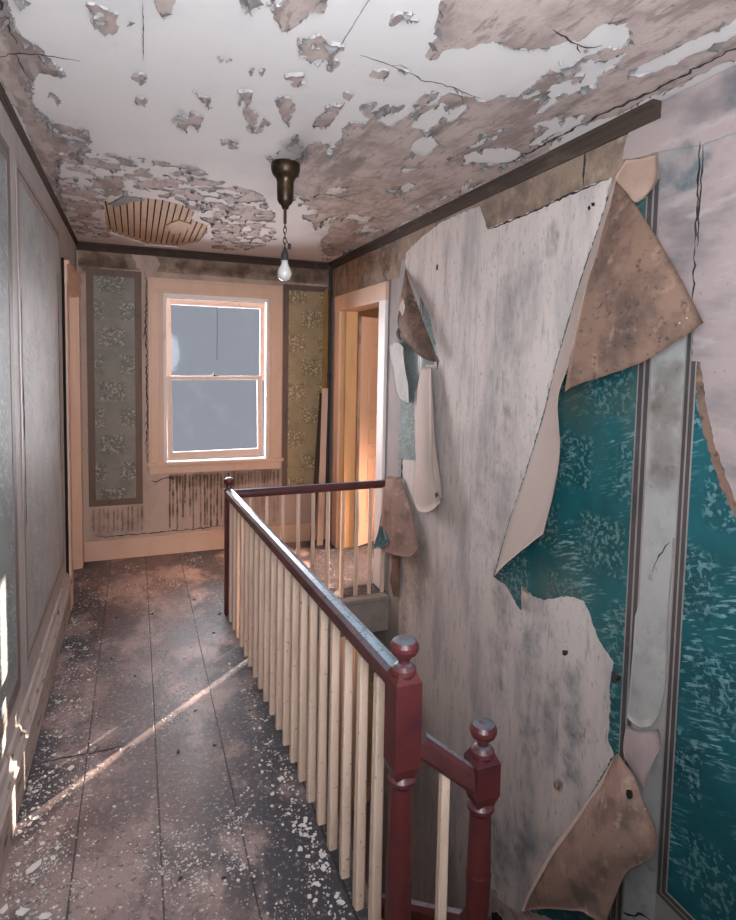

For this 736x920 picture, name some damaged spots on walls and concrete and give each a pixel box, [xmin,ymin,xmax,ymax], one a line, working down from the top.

crack [0,0,77,75]
peeling [239,0,345,73]
peeling [0,0,277,251]
peeling [265,0,736,261]
crack [692,144,703,298]
water stain [169,473,243,529]
crack [623,911,650,920]